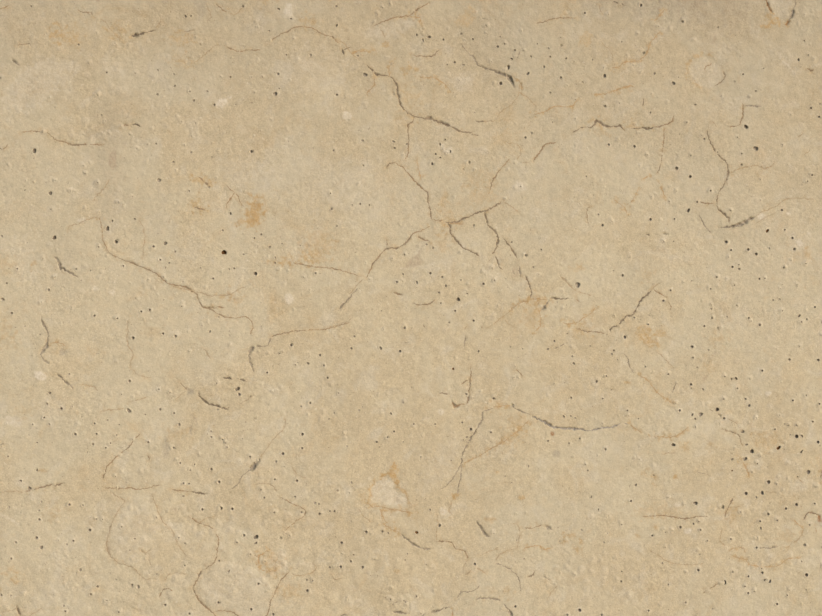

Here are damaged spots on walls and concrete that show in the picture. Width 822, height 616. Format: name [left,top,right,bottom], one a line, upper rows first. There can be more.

crack [122,12,168,43]
crack [368,0,433,42]
crack [696,97,817,238]
crack [94,30,680,415]
crack [48,252,85,280]
crack [231,413,291,493]
crack [360,325,694,559]
crack [96,429,294,616]
crack [518,518,555,581]
crack [385,591,520,616]